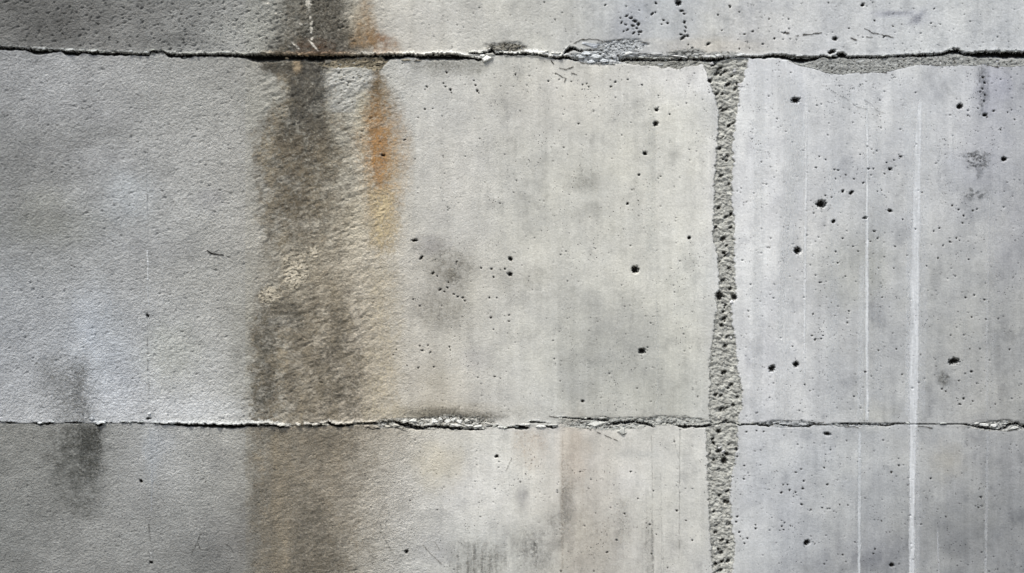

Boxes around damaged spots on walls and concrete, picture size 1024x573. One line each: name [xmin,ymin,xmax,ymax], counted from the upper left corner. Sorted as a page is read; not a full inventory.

corrosion [352,16,398,246]
crack [0,28,1024,97]
damp [247,0,375,573]
spalling [563,10,889,573]
crack [0,413,1024,441]